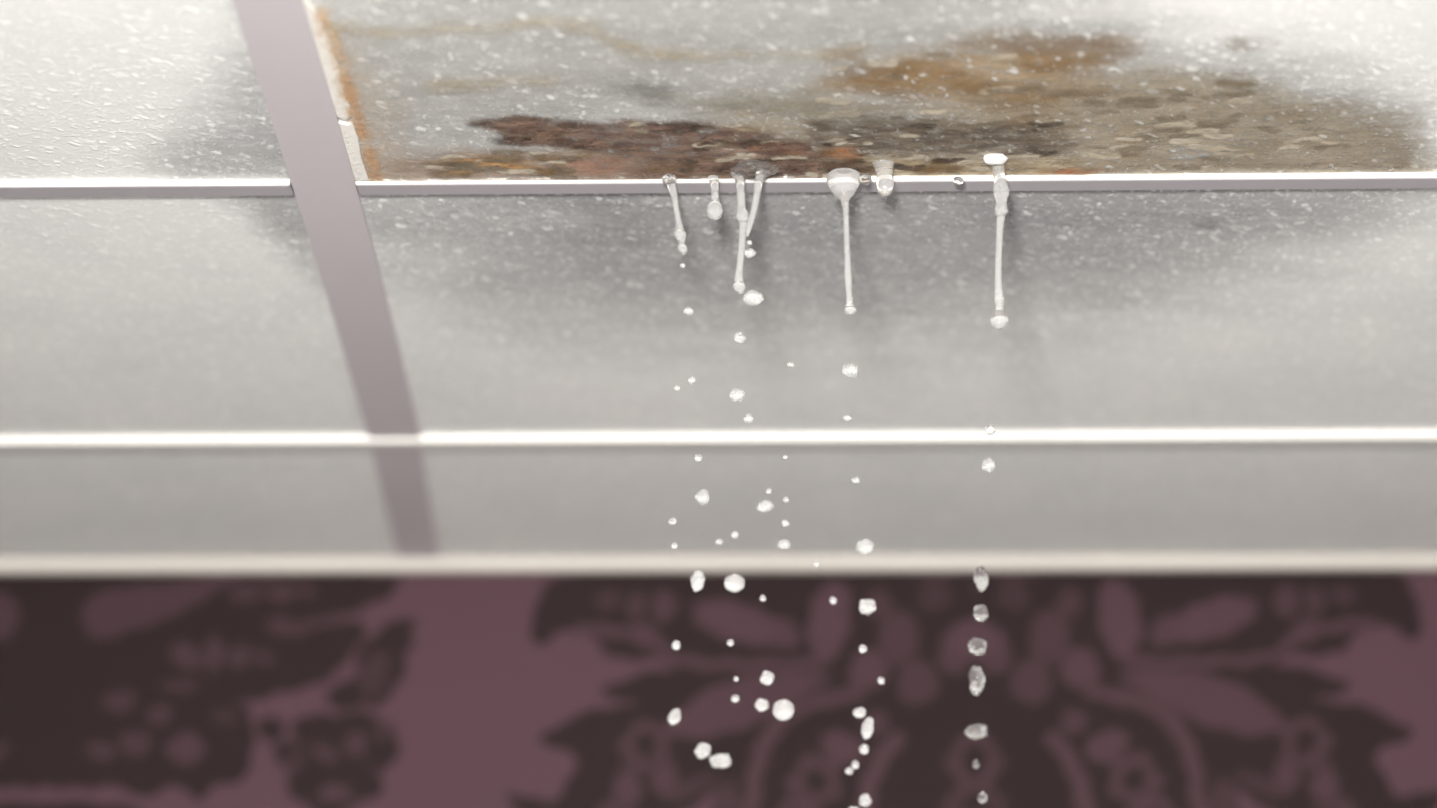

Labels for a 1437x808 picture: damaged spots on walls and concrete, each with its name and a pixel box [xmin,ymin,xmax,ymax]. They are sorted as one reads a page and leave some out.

leakage [328,0,1395,178]